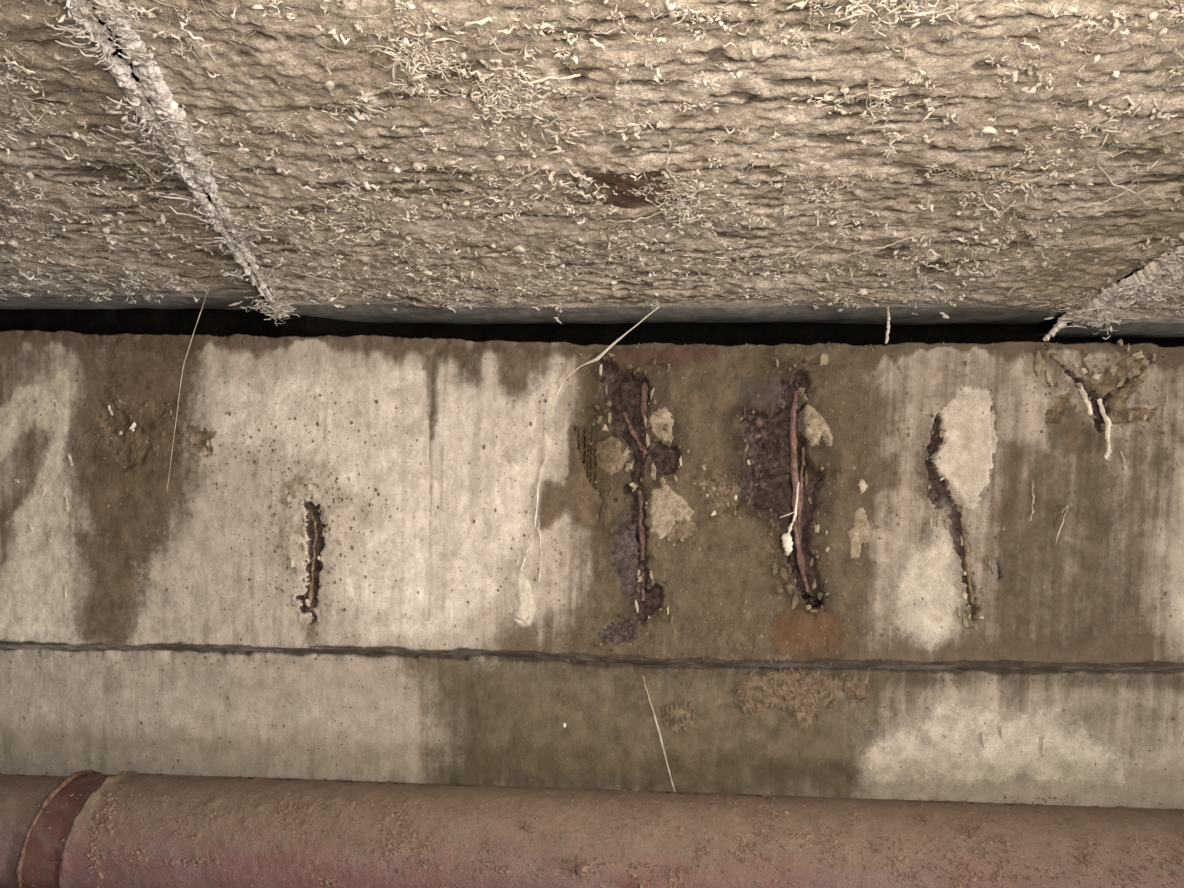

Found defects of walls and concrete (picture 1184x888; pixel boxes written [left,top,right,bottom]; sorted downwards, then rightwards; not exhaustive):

water stain [0,334,1184,796]
spalling [591,353,698,652]
spalling [693,348,844,617]
spalling [1033,339,1157,460]